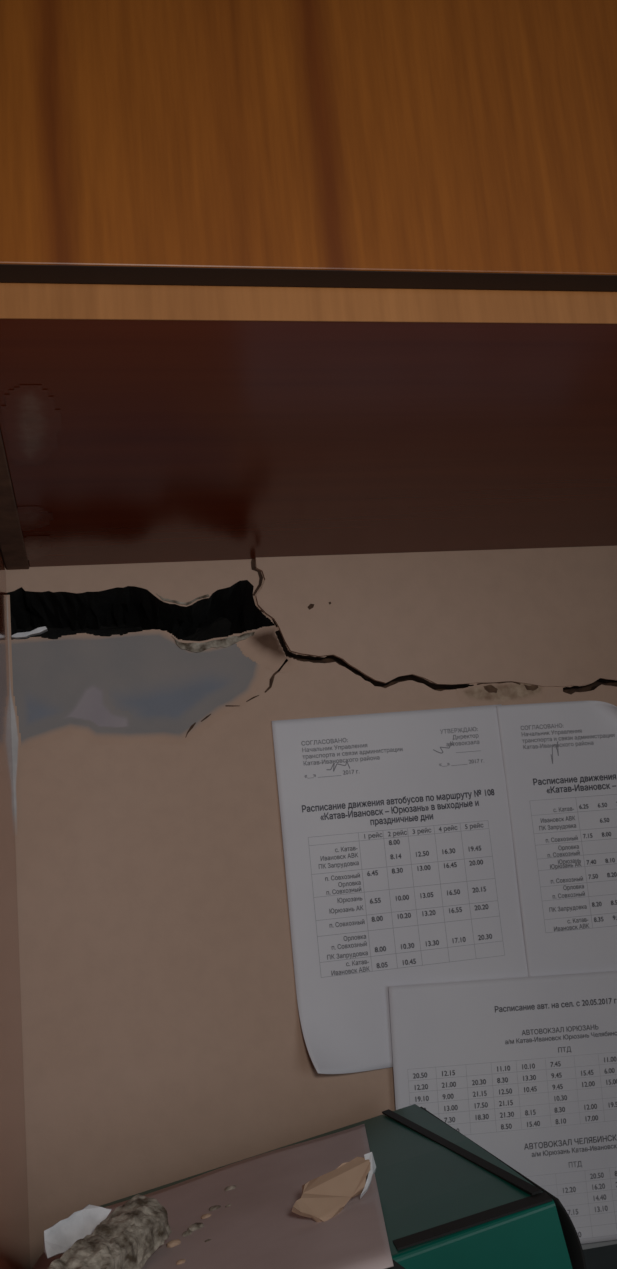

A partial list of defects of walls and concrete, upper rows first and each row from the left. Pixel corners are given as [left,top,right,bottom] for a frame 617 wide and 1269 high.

peeling [6,580,300,753]
crack [185,559,617,738]